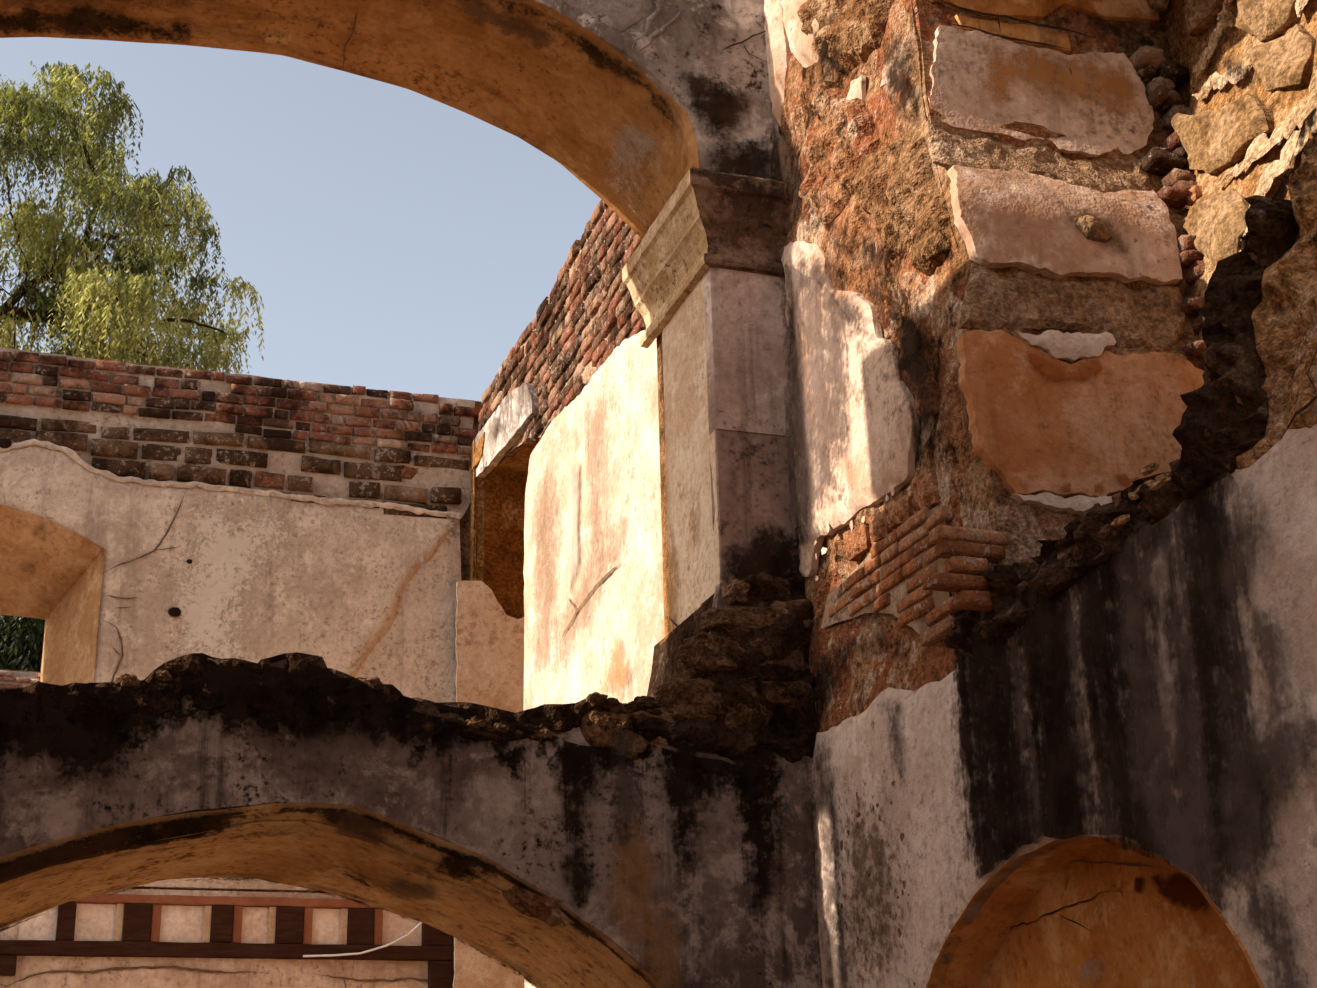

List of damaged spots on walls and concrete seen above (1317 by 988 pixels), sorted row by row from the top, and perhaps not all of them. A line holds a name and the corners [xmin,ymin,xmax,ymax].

leakage [0,0,191,43]
leakage [459,0,674,124]
spalling [797,0,1150,275]
leakage [686,72,933,596]
spalling [959,262,1185,362]
flaking render [806,523,830,581]
flaking render [850,486,912,532]
peeling [1110,462,1172,529]
leakage [0,506,784,988]
spalling [580,709,674,762]
leakage [953,472,1317,988]
crack [1010,860,1163,931]